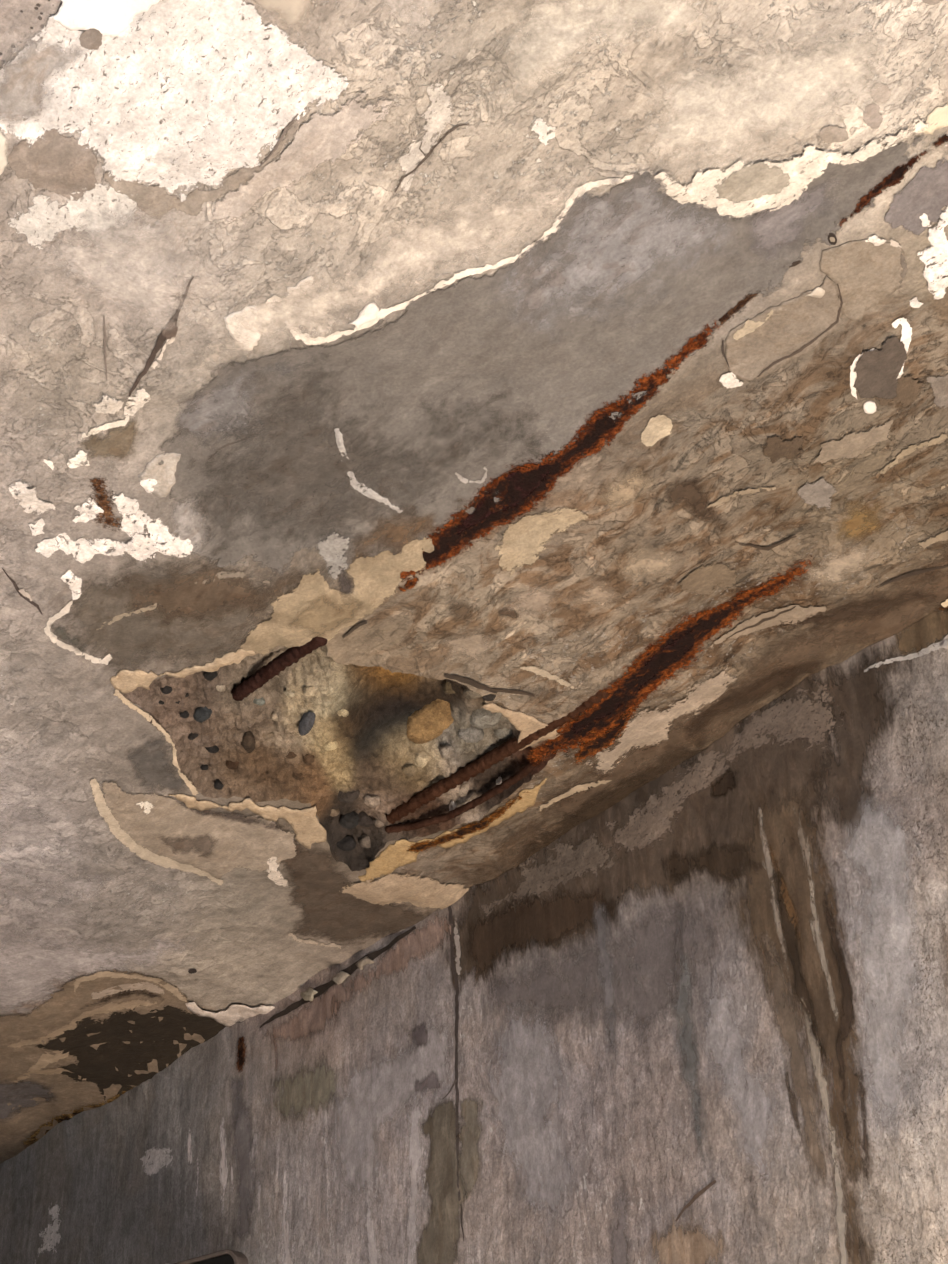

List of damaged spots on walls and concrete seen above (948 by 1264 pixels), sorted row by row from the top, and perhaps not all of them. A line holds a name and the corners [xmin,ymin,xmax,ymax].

flaking render [0,0,351,289]
flaking render [395,83,454,193]
spalling [44,117,932,910]
corrosion [400,290,761,592]
water stain [667,478,722,524]
peeling [880,434,948,474]
peeling [918,531,948,549]
corrosion [528,559,813,765]
peeling [864,635,948,672]
crack [260,926,416,1028]
crack [442,906,464,1241]
water stain [447,547,948,1264]